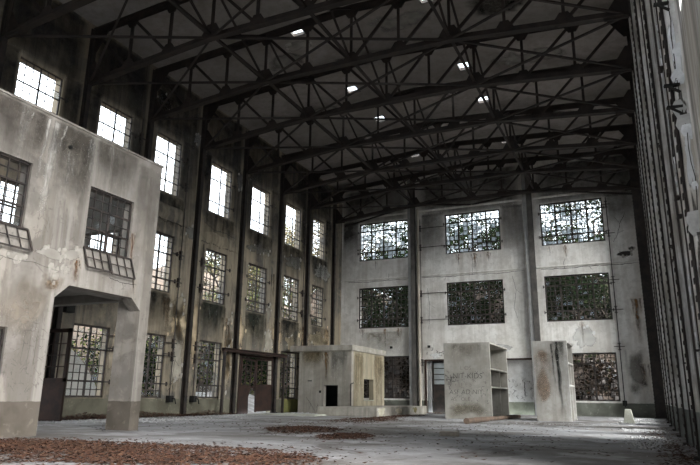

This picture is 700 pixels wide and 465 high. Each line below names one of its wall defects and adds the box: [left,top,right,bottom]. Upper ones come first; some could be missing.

leakage [0,94,27,130]
leakage [31,112,119,196]
flaking render [36,244,83,285]
spalling [617,246,636,258]
leakage [630,357,646,392]